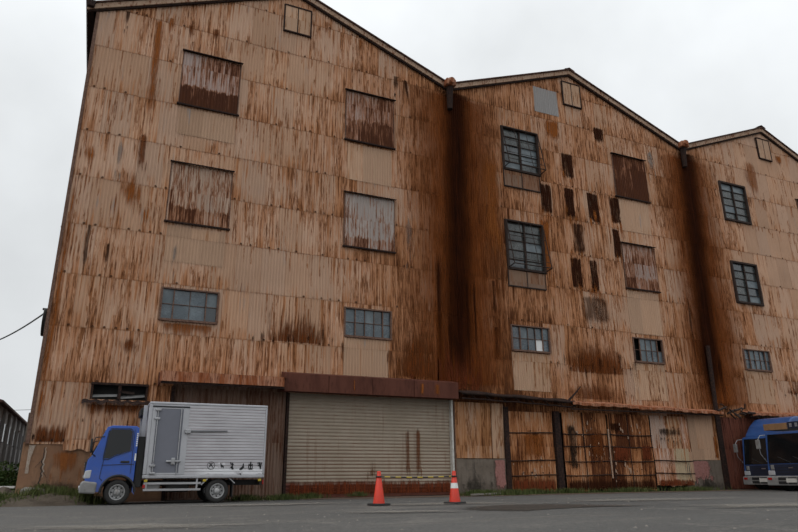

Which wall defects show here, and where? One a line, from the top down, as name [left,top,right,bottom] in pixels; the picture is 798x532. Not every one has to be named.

corrosion [149,18,173,123]
corrosion [137,134,147,170]
corrosion [593,127,604,153]
corrosion [110,177,149,231]
corrosion [540,183,555,295]
corrosion [561,153,607,320]
corrosion [609,196,623,270]
corrosion [29,147,99,479]
corrosion [252,311,343,351]
corrosion [557,340,637,400]
corrosion [289,430,450,495]
corrosion [570,446,694,490]